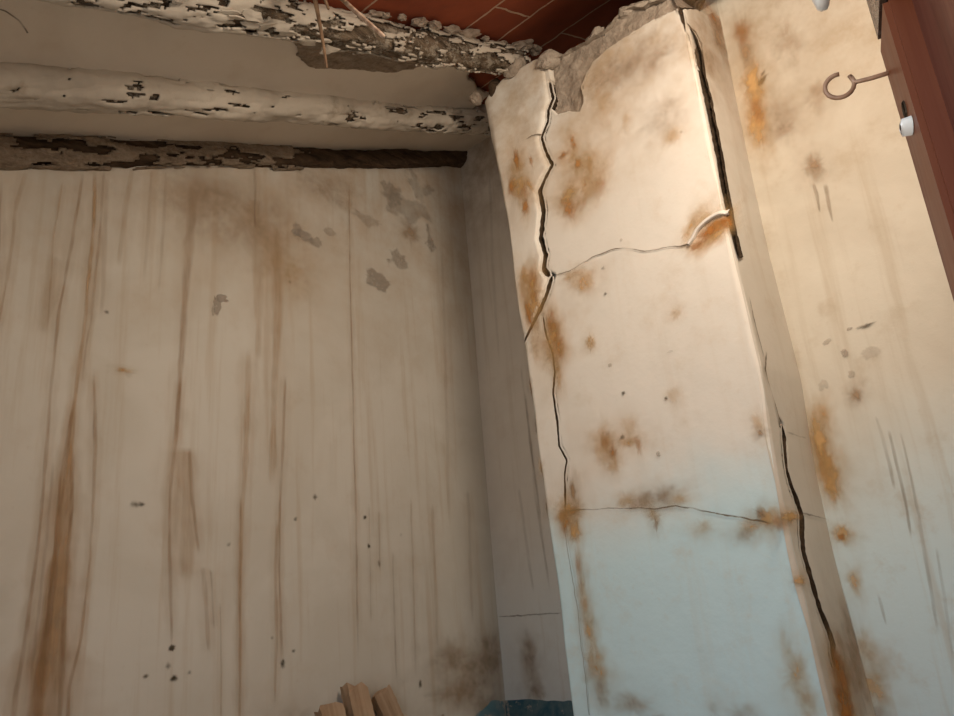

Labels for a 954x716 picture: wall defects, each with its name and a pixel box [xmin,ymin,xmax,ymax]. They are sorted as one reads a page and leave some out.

flaking render [217,9,421,73]
flaking render [550,0,680,117]
crack [678,7,743,259]
corrosion [741,38,765,141]
corrosion [694,218,732,249]
corrosion [522,275,537,325]
crack [524,81,767,715]
crack [751,306,837,668]
corrosion [813,418,838,494]